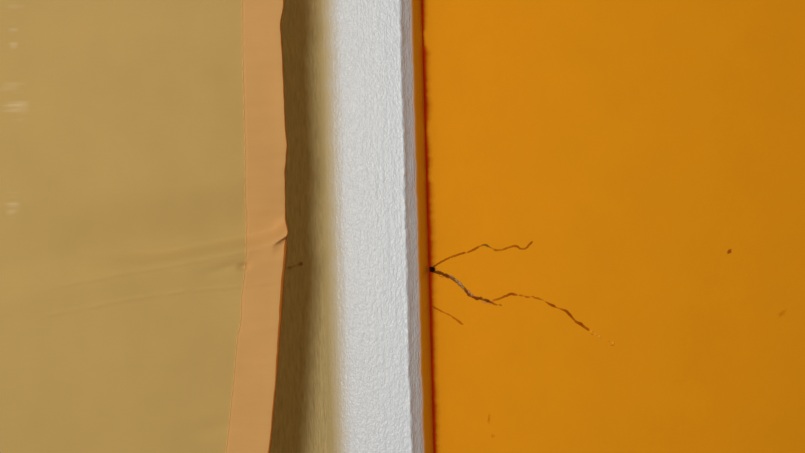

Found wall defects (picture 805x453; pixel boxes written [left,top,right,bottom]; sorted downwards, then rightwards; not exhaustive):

crack [421,0,614,453]